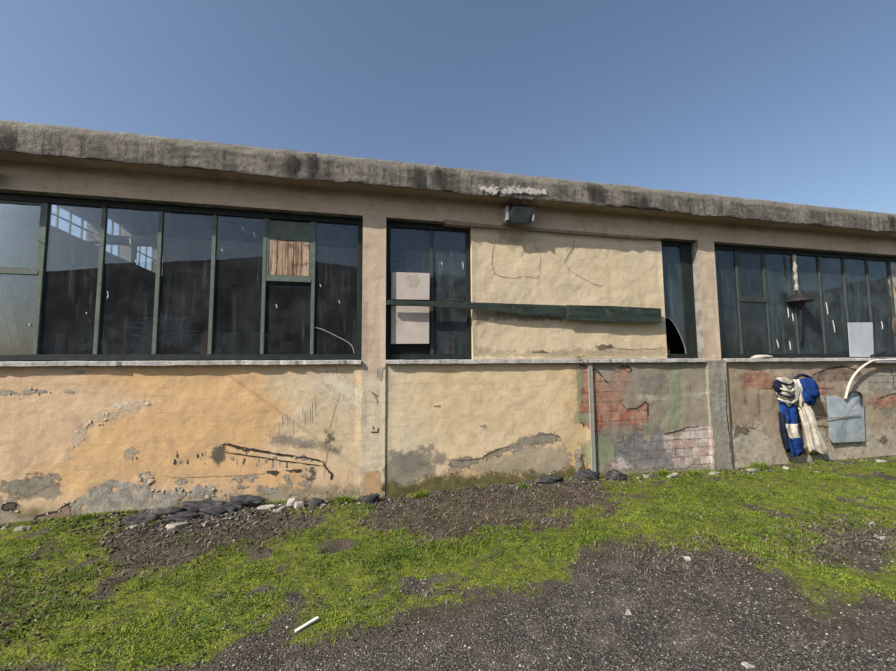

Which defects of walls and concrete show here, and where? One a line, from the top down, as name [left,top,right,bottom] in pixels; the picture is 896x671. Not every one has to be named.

leakage [284,153,317,179]
leakage [411,167,445,188]
leakage [587,182,606,202]
crack [492,231,541,278]
peeling [0,387,50,396]
spalling [577,363,896,471]
spalling [448,432,586,478]
spalling [1,502,17,512]